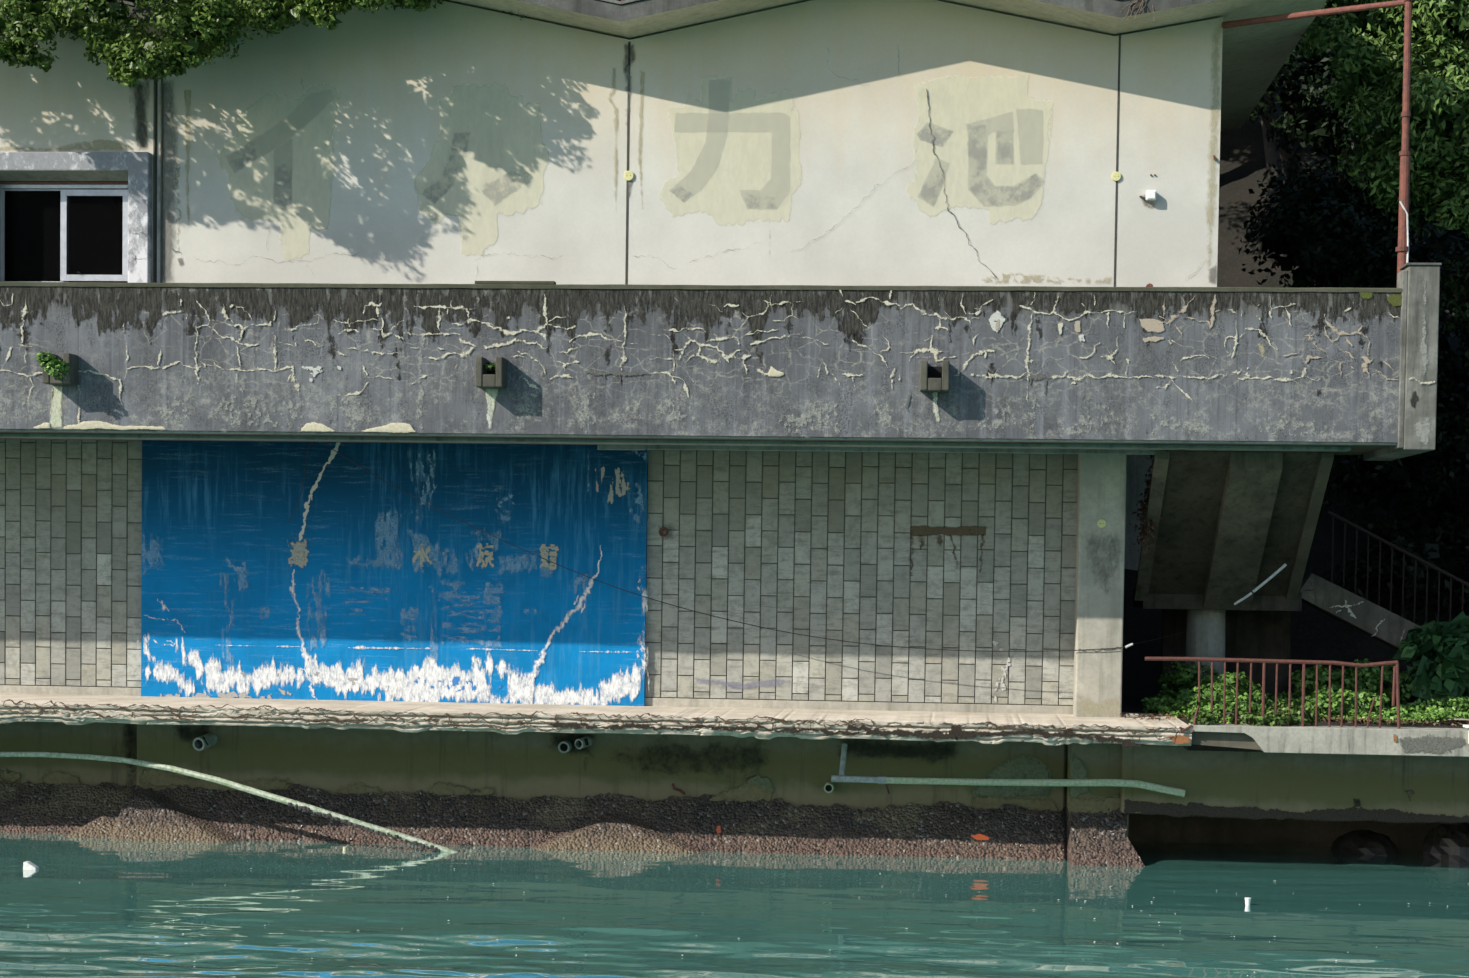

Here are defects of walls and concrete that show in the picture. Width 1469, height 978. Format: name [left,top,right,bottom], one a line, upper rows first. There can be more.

damp [609,45,644,196]
damp [1208,34,1219,225]
damp [0,81,1401,435]
crack [77,50,1435,424]
crack [0,293,43,401]
spalling [989,310,1005,332]
spalling [1058,321,1085,341]
spalling [1139,319,1164,342]
damp [1420,279,1428,373]
damp [779,403,841,436]
damp [1410,391,1430,445]
peeling [142,449,649,705]